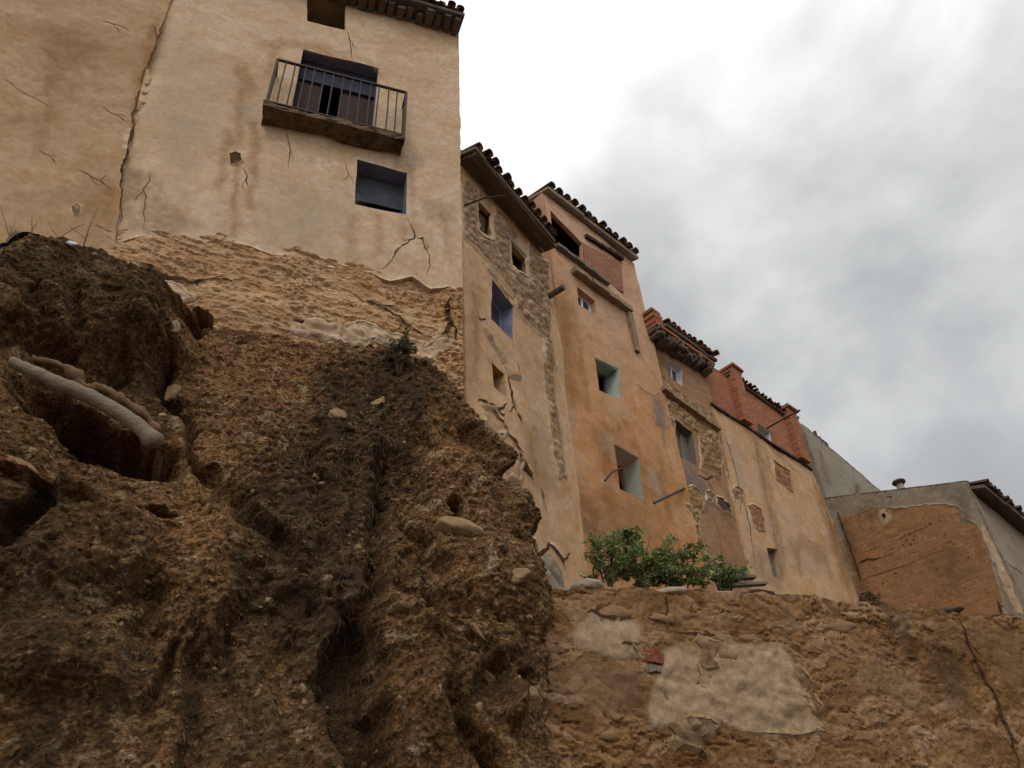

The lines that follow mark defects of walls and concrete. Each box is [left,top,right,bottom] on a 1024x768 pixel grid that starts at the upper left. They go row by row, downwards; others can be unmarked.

crack [39,19,245,284]
spalling [165,280,196,302]
spalling [285,317,454,363]
crack [381,219,431,272]
crack [353,293,522,422]
flaking render [461,179,568,486]
flaking render [659,366,766,569]
flaking render [648,633,826,754]
crack [961,621,1020,767]